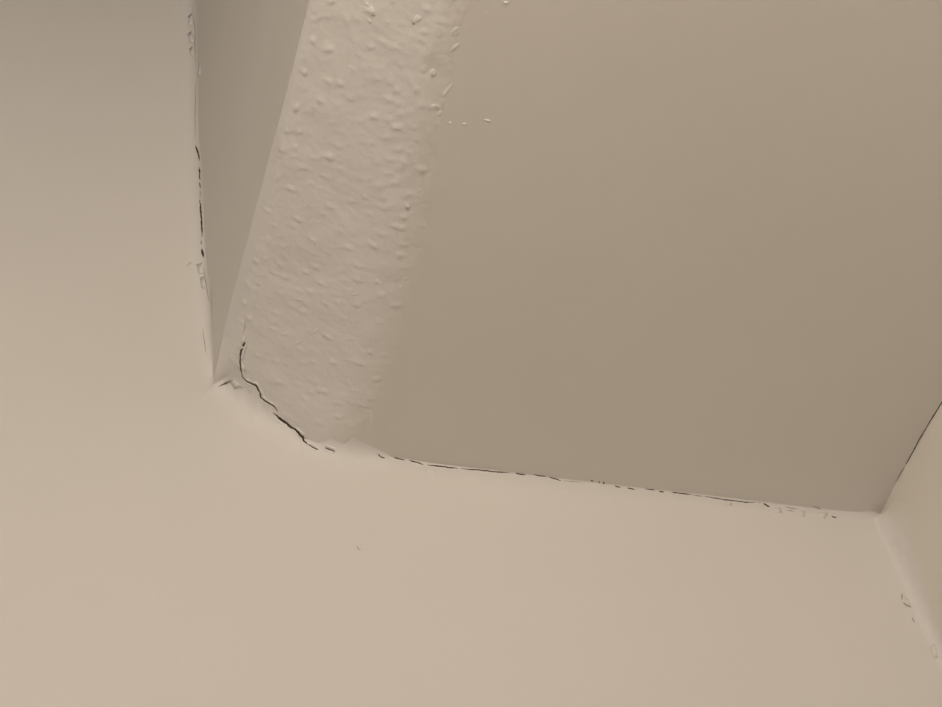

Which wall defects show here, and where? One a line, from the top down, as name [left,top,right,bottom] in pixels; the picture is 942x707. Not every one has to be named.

crack [194,145,208,294]
crack [223,327,336,454]
crack [378,453,836,519]